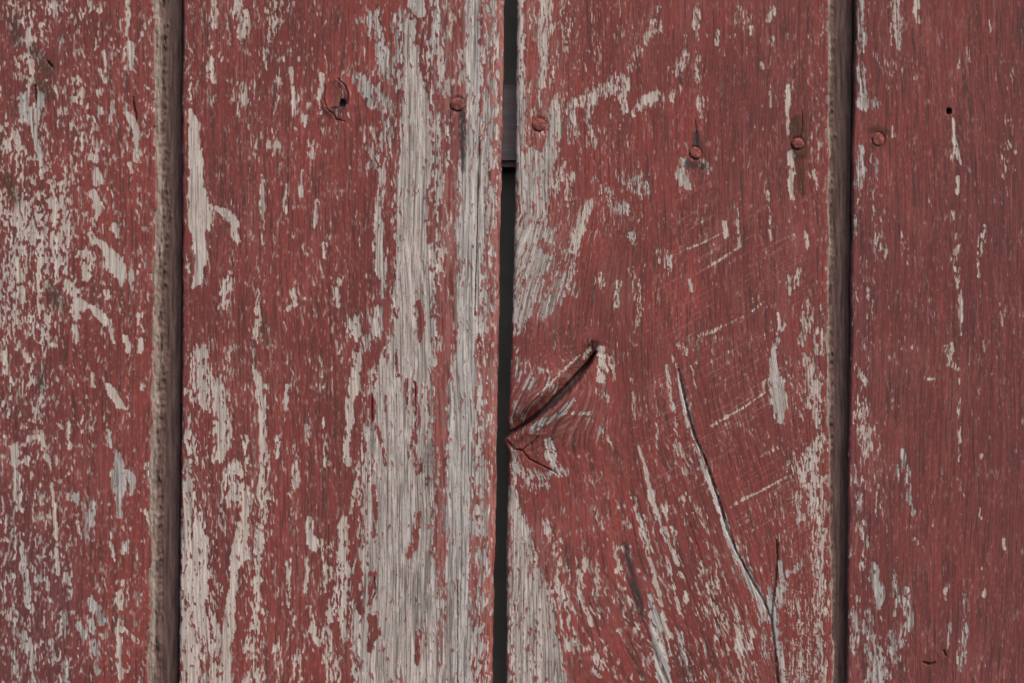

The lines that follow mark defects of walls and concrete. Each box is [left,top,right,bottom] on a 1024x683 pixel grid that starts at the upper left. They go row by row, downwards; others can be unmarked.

peeling [0,0,150,683]
peeling [186,76,241,289]
peeling [206,45,229,84]
peeling [218,271,234,310]
peeling [209,0,251,40]
peeling [179,343,329,683]
peeling [263,0,325,228]
peeling [285,0,704,683]
crack [506,352,597,474]
crack [677,365,780,683]
peeling [654,299,830,683]
peeling [788,150,796,200]